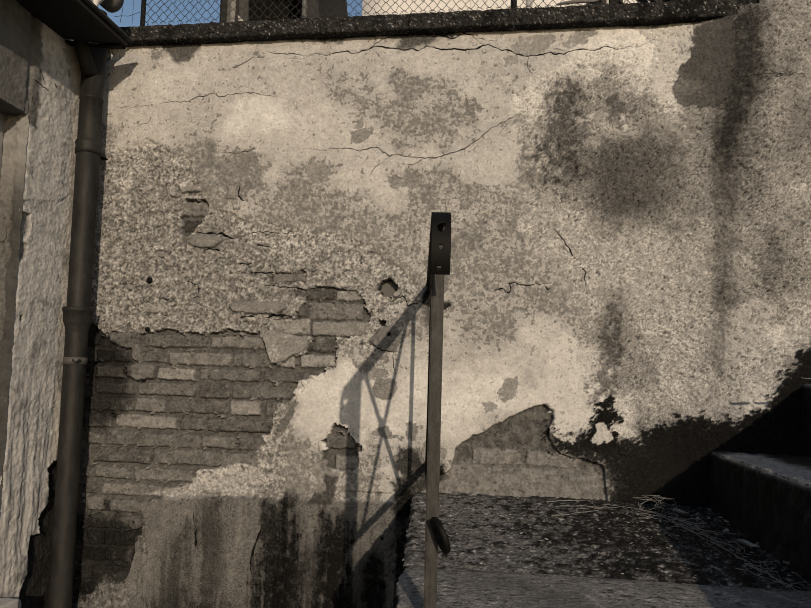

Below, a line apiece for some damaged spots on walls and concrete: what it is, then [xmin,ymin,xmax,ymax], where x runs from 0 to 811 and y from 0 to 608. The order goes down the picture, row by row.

crack [225,33,655,73]
crack [313,107,528,175]
flaking render [180,198,209,247]
flaking render [72,269,390,605]
damp [247,447,426,608]